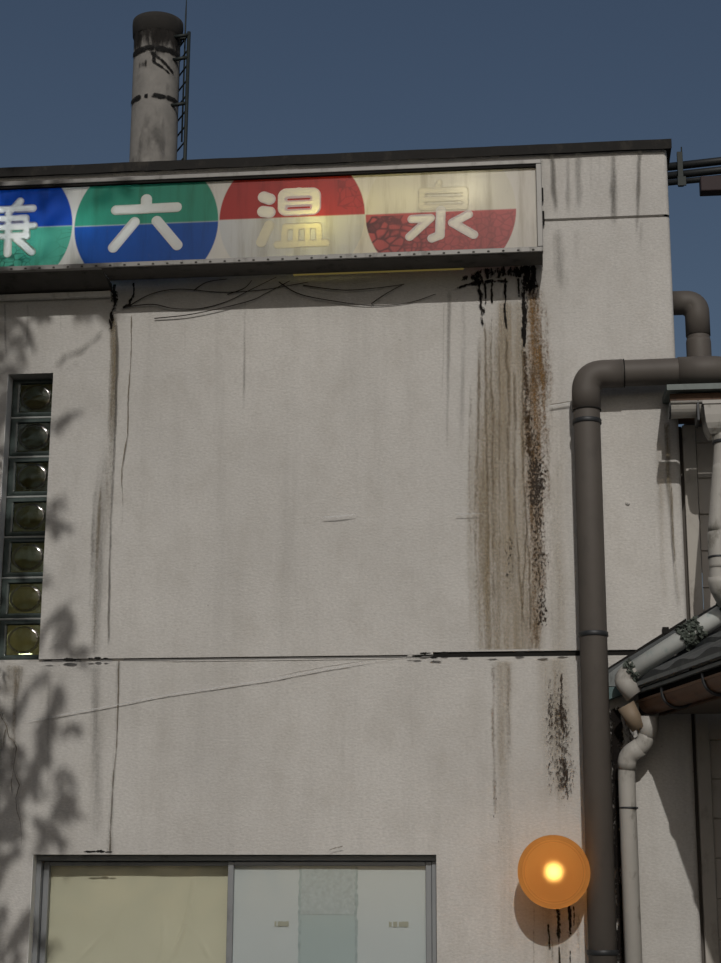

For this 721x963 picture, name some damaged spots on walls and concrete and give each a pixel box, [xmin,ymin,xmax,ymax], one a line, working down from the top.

water stain [109,283,135,441]
corrosion [479,288,549,648]
crack [0,655,415,851]
water stain [546,674,575,799]
water stain [547,906,575,963]